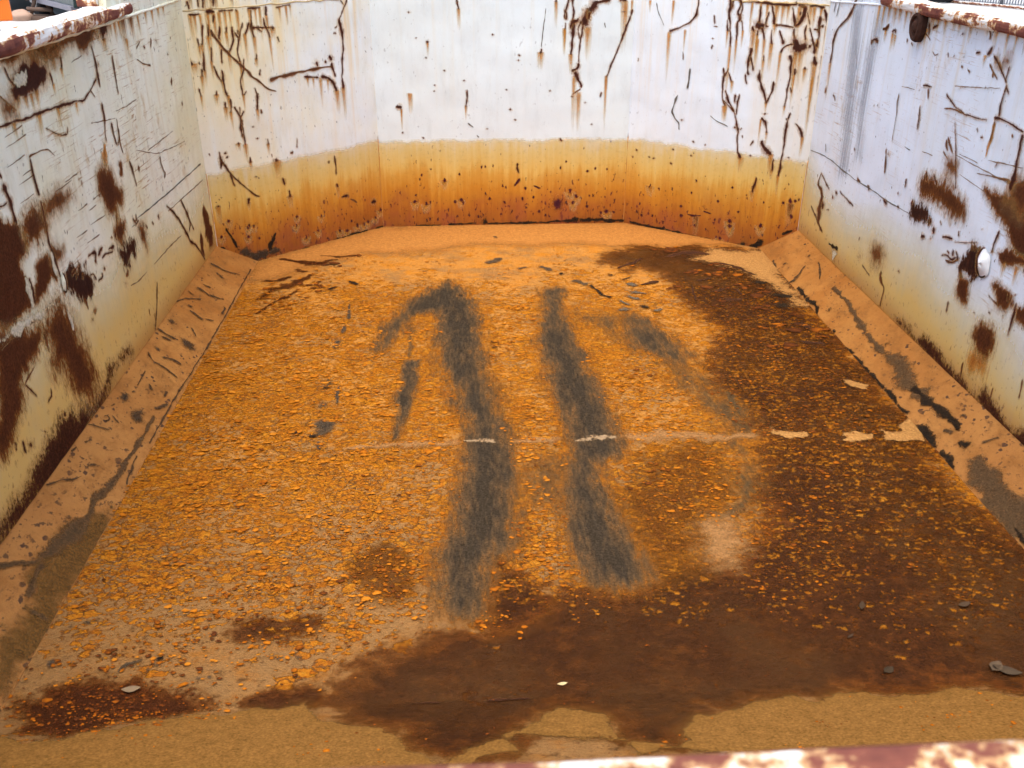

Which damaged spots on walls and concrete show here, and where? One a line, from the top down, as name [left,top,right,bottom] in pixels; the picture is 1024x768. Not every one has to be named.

rust [0,7,164,67]
rust [186,0,261,103]
rust [620,0,633,26]
rust [750,0,835,100]
rust [877,4,912,42]
rust [0,93,1024,545]
water stain [236,244,1024,764]
water stain [0,415,218,738]
rust [347,543,413,600]
rust [223,614,326,643]